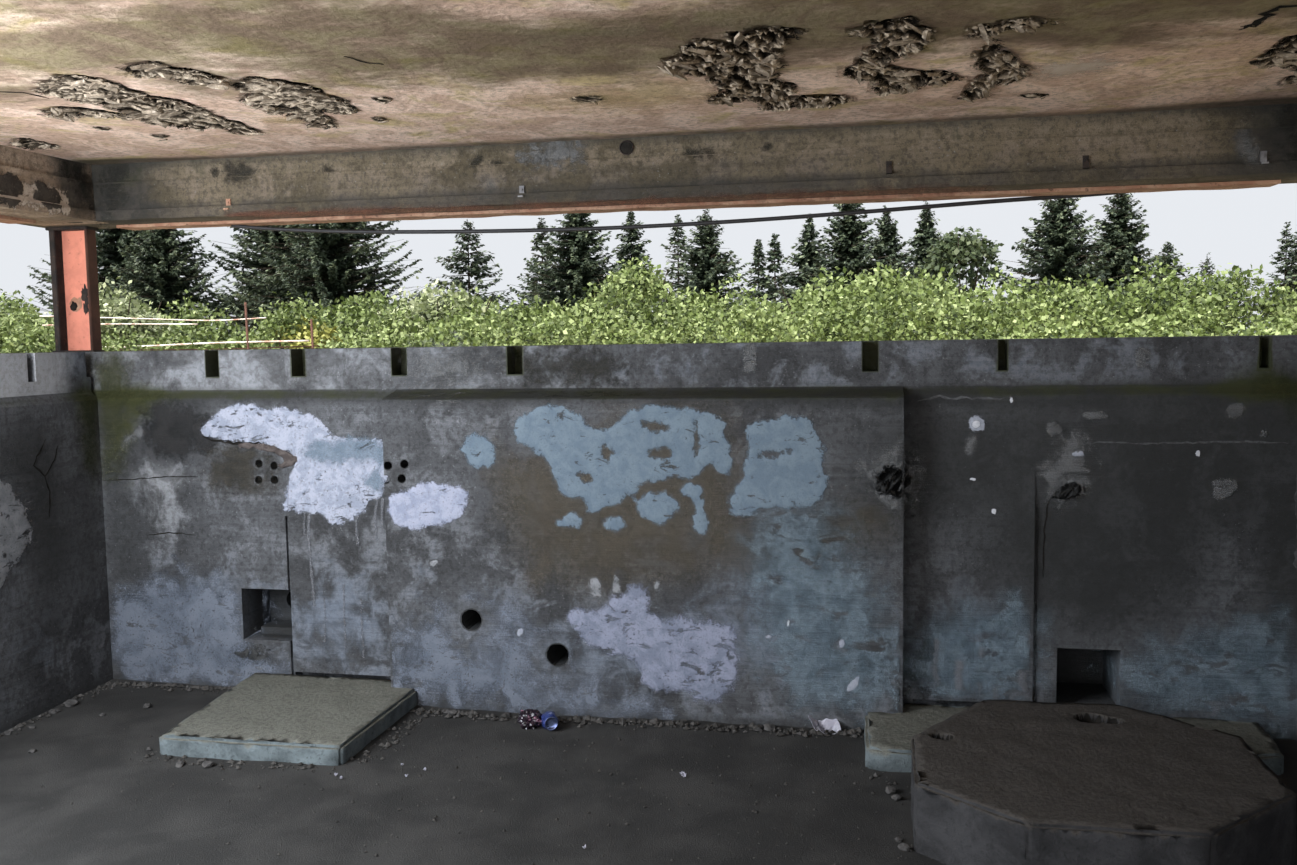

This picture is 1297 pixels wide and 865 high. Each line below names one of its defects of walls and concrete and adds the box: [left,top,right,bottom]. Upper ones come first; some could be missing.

spalling [31,61,393,141]
spalling [656,15,1061,112]
spalling [1249,34,1297,86]
peeling [0,171,71,217]
corrosion [69,284,89,315]
peeling [200,403,469,530]
peeling [513,403,829,535]
peeling [0,479,32,588]
peeling [567,575,739,703]